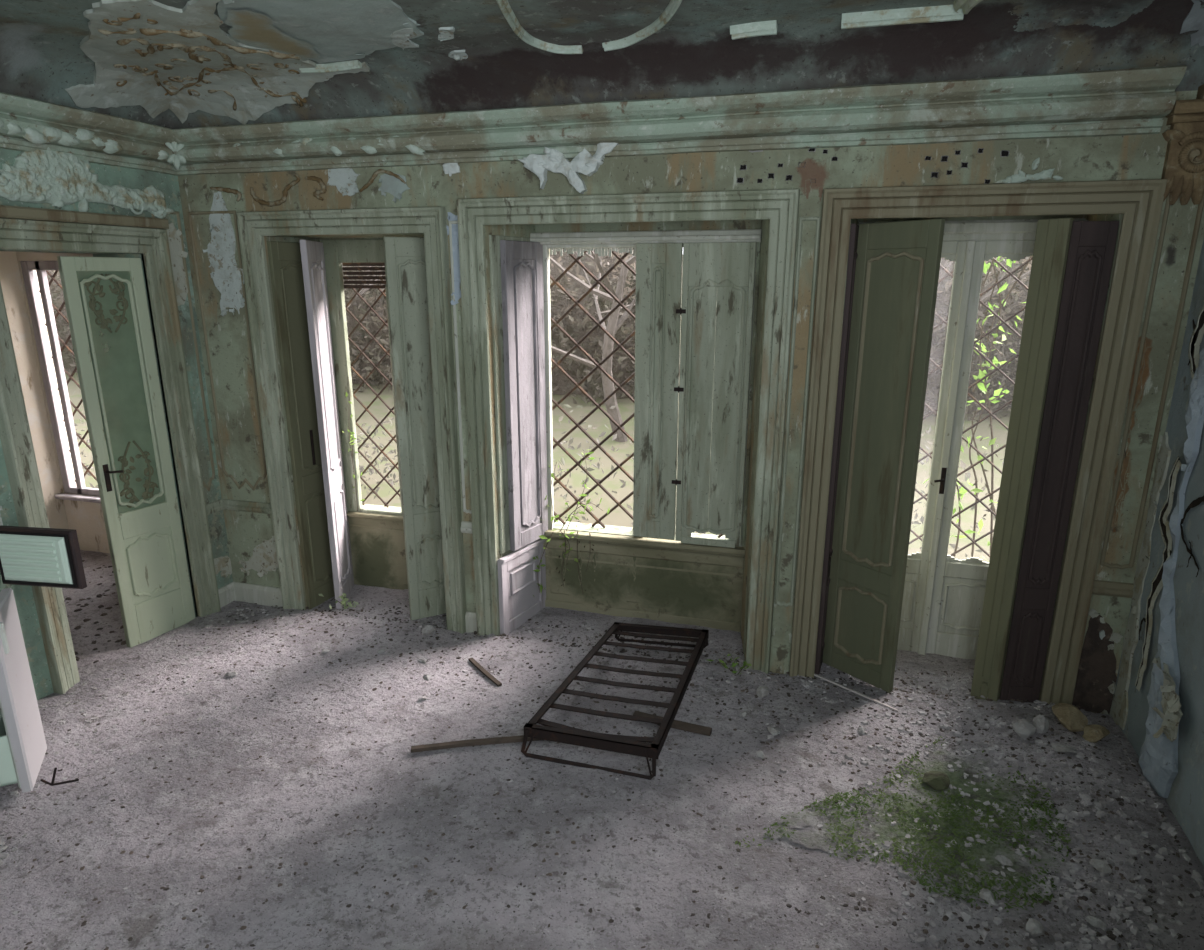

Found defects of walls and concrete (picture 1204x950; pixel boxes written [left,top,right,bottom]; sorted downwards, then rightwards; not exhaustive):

flaking render [216,0,468,63]
water stain [410,0,1204,113]
flaking render [1180,0,1204,47]
peeling [202,191,245,316]
crack [1135,454,1204,691]
peeling [1152,657,1183,742]